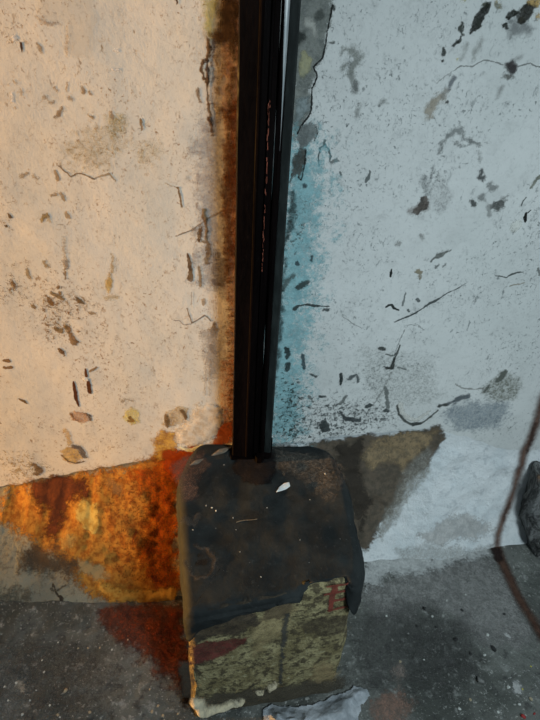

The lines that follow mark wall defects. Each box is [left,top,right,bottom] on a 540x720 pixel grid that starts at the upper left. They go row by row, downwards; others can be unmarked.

spalling [442,1,500,62]
spalling [502,0,540,34]
spalling [290,0,333,182]
water stain [438,128,481,154]
corrosion [212,0,239,444]
spalling [408,196,429,215]
water stain [272,127,446,551]
crack [385,287,460,345]
spalling [154,406,202,461]
corrosion [0,446,194,708]